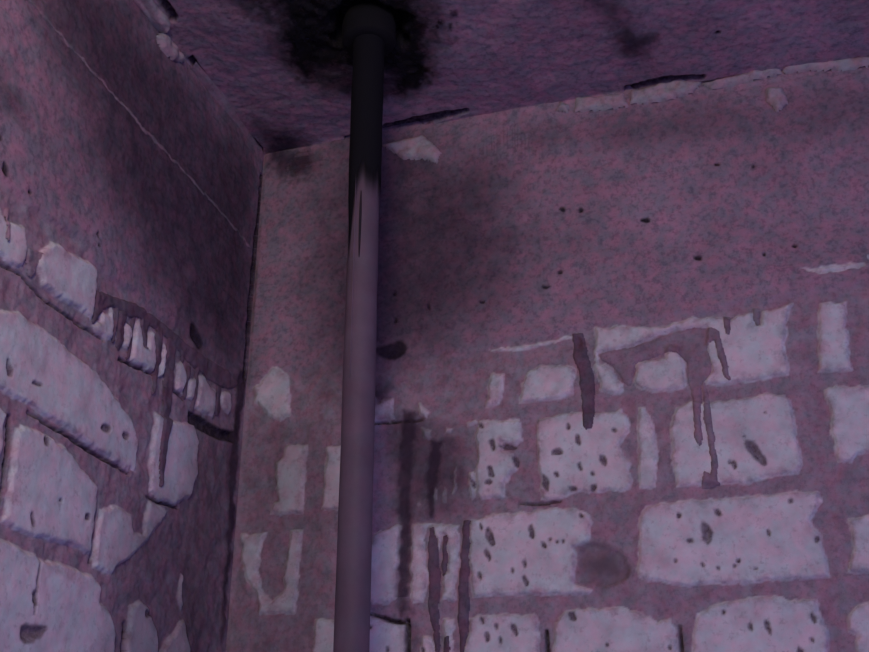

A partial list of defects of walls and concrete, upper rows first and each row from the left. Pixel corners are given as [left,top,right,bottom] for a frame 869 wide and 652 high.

flaking render [156,33,185,64]
flaking render [555,57,869,114]
flaking render [382,135,442,164]
water stain [714,317,731,380]
water stain [572,333,595,430]
crack [32,417,126,475]
water stain [91,291,245,631]
water stain [691,383,720,489]
spalling [746,441,766,465]
water stain [398,413,447,597]
water stain [428,520,471,652]
spalling [20,625,46,643]